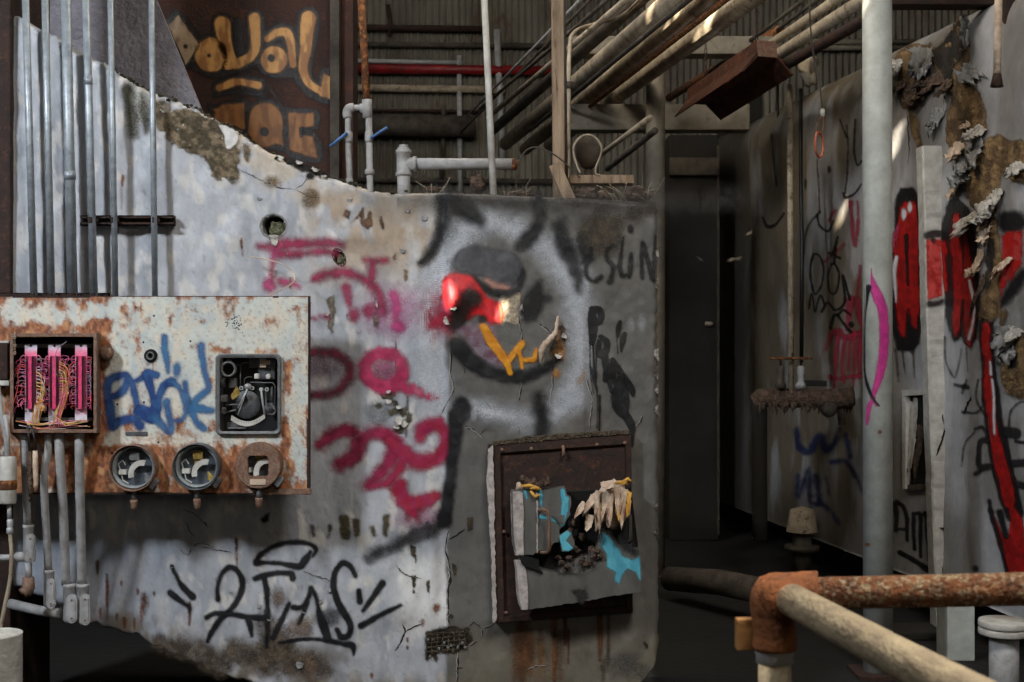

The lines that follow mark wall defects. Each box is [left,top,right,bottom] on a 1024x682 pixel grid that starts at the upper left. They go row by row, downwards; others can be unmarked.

spalling [156,100,250,184]
crack [239,169,319,198]
peeling [892,15,1024,399]
peeling [538,316,567,363]
spalling [375,390,412,434]
spalling [425,614,473,662]